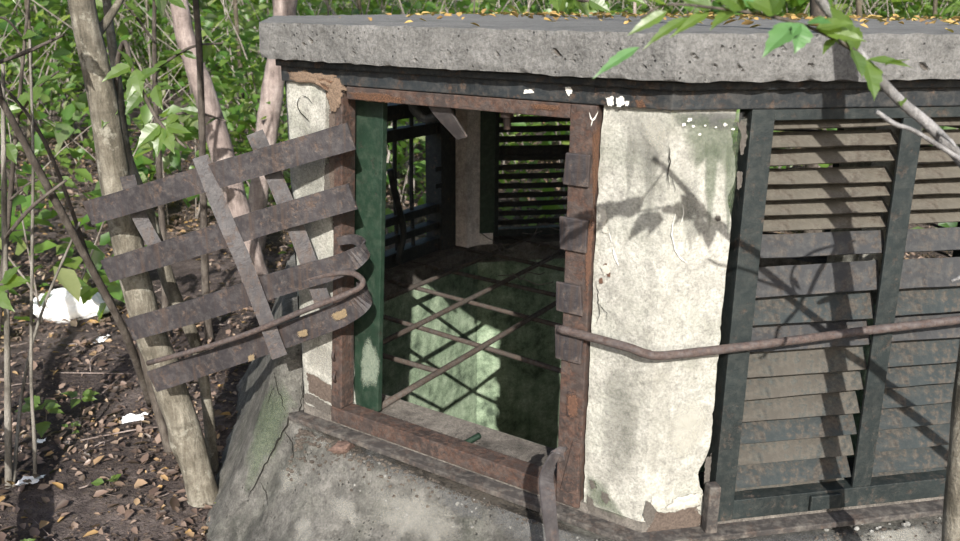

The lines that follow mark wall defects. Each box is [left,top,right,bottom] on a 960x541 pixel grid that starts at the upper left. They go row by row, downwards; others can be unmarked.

spalling [288,70,346,128]
rust [352,93,401,103]
water stain [687,113,736,200]
spalling [682,118,748,155]
crack [247,368,303,509]
spalling [643,453,712,532]